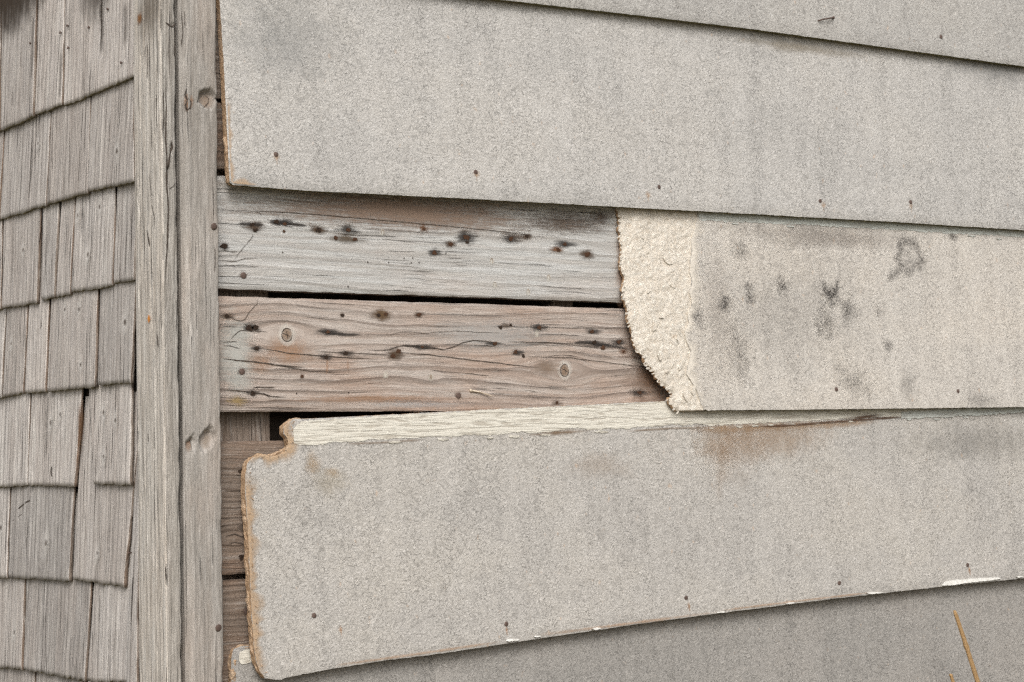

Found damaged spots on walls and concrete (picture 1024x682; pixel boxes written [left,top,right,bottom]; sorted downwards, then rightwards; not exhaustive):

peeling [227,208,1024,682]